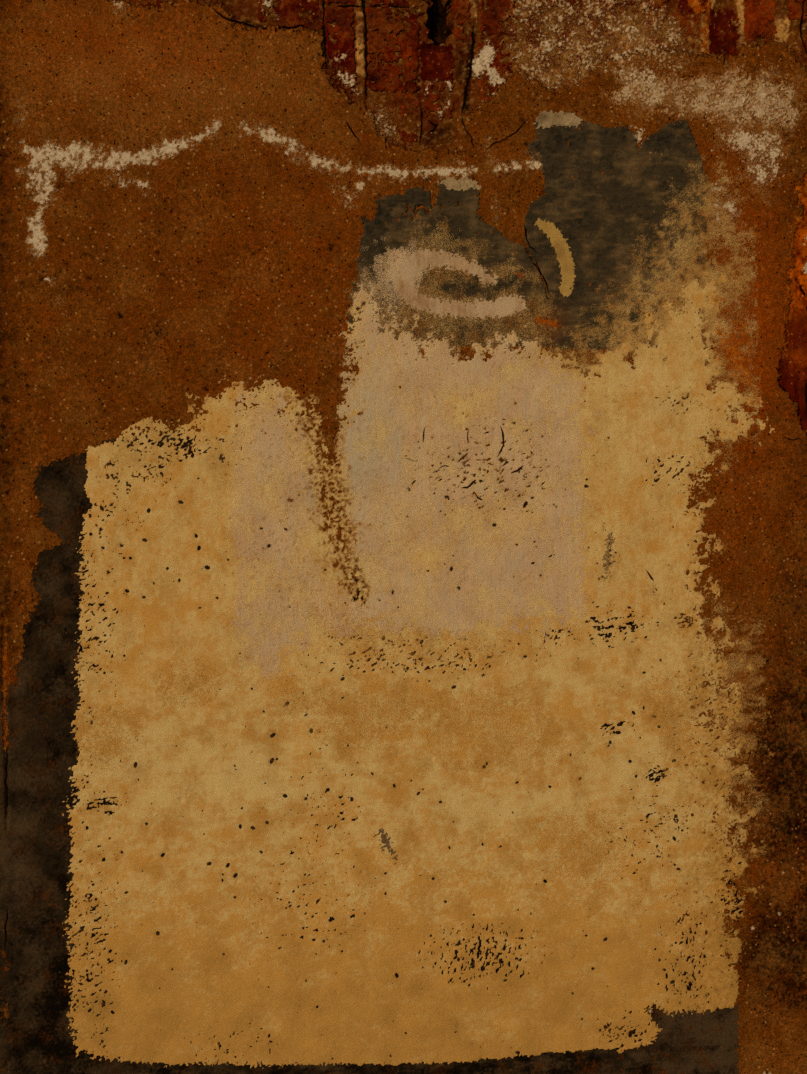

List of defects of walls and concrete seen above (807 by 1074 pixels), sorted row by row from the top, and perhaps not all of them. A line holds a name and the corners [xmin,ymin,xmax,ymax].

efflorescence [10,96,222,327]
efflorescence [360,103,410,146]
efflorescence [235,118,545,210]
spalling [108,0,807,155]
efflorescence [472,0,807,234]
peeling [359,449,569,596]